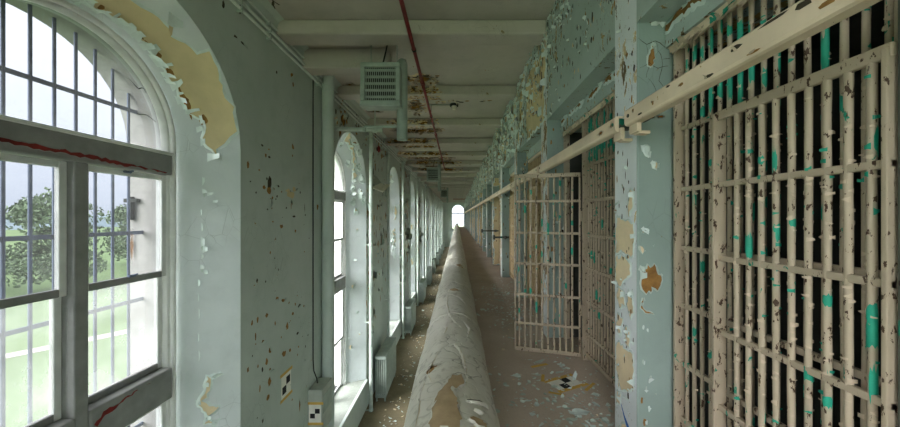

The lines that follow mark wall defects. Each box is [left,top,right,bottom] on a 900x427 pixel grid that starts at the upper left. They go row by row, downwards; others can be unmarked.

peeling [75,0,240,162]
peeling [196,372,225,427]
peeling [335,73,469,338]
peeling [426,374,488,427]
peeling [464,0,618,322]
peeling [587,138,663,426]